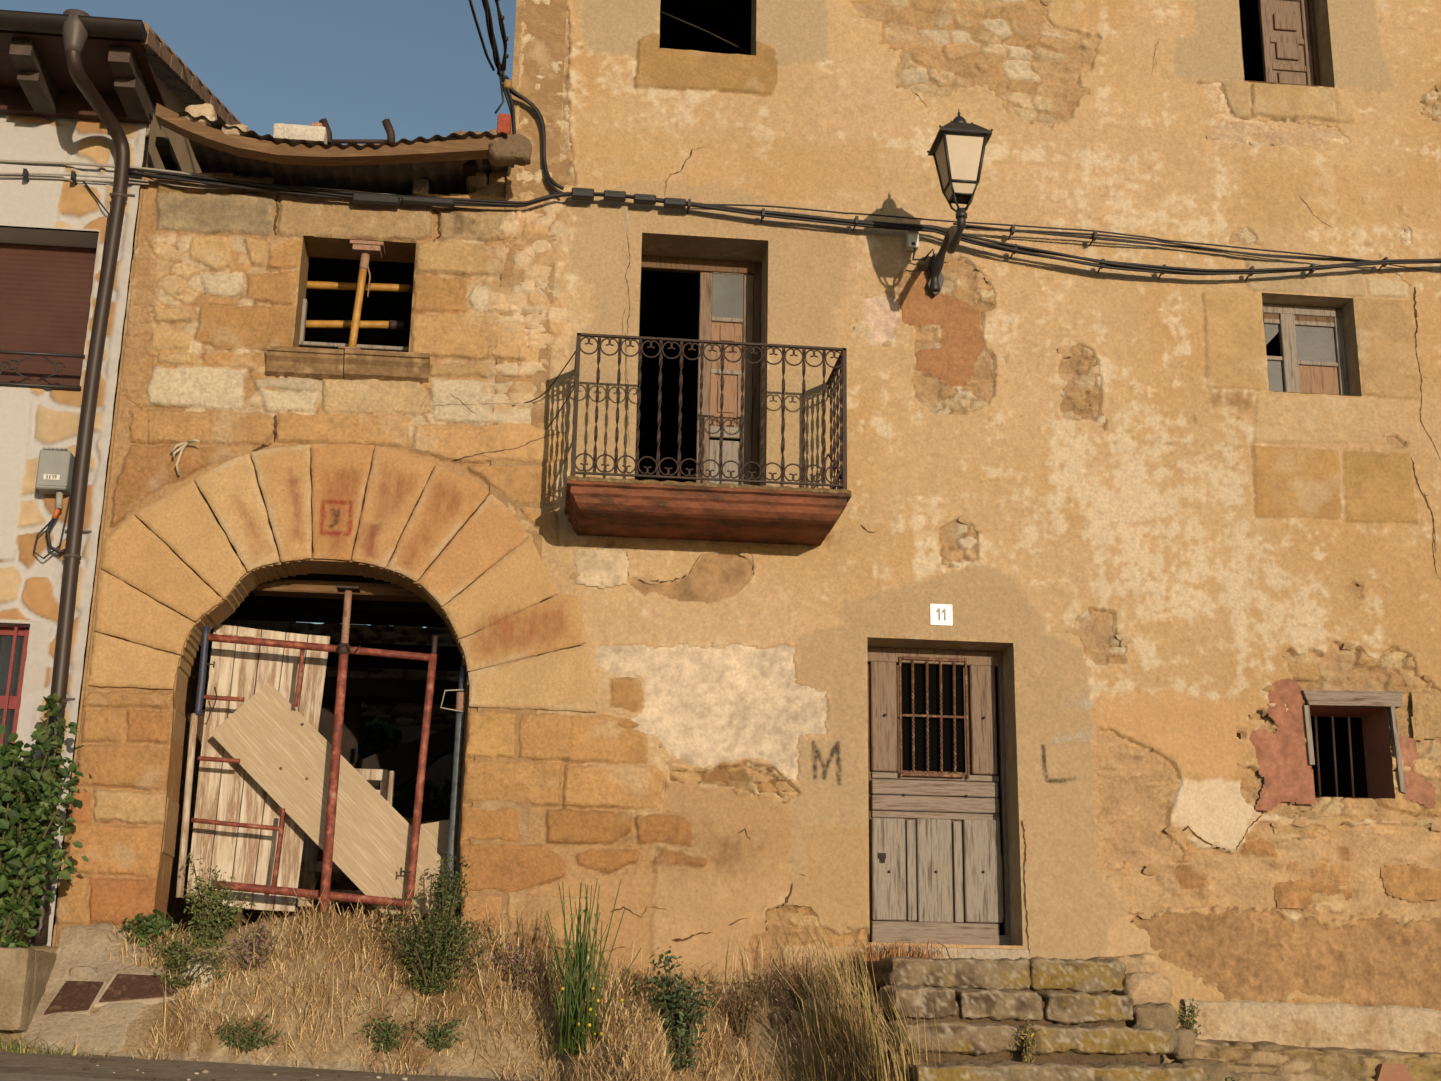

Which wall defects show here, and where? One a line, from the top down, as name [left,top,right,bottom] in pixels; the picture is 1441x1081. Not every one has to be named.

spalling [851,0,1100,128]
spalling [1196,82,1350,147]
spalling [1419,83,1441,124]
spalling [853,251,996,416]
spalling [1057,347,1106,429]
crack [1396,273,1441,580]
spalling [939,514,984,568]
spalling [1065,609,1134,665]
peeling [596,641,828,804]
spalling [1096,641,1441,1011]
spalling [744,906,869,977]